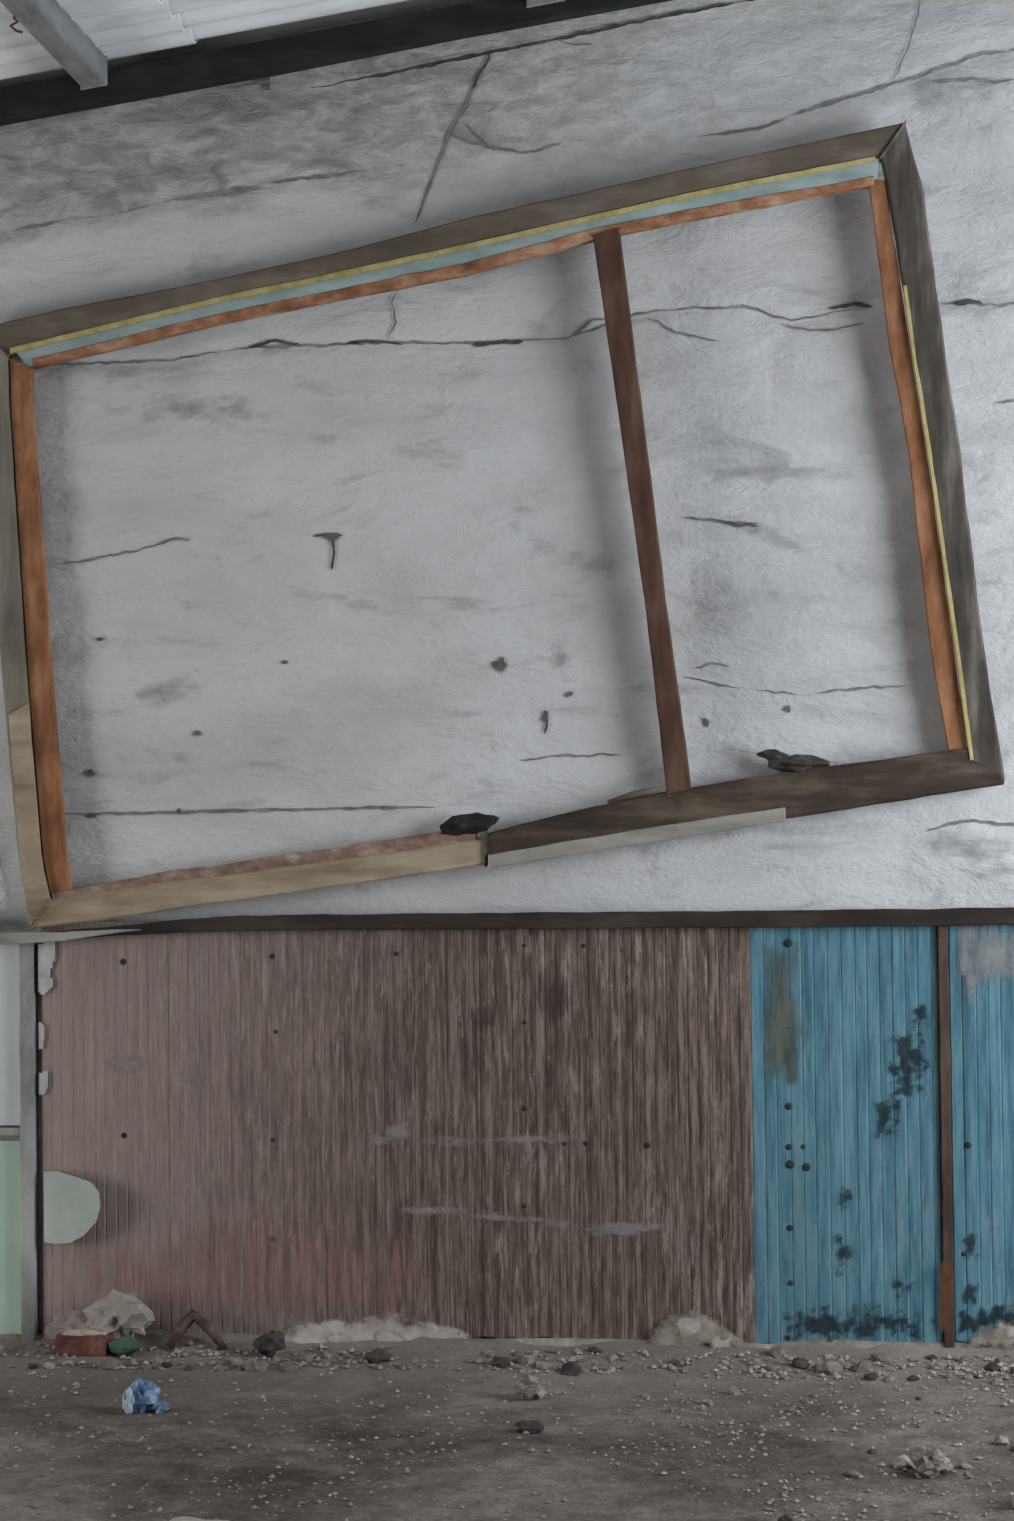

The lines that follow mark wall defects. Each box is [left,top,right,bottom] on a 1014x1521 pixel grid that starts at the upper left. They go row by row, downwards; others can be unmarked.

crack [699,0,1014,137]
crack [311,0,755,223]
crack [54,290,873,366]
crack [522,753,617,761]
crack [65,805,435,815]